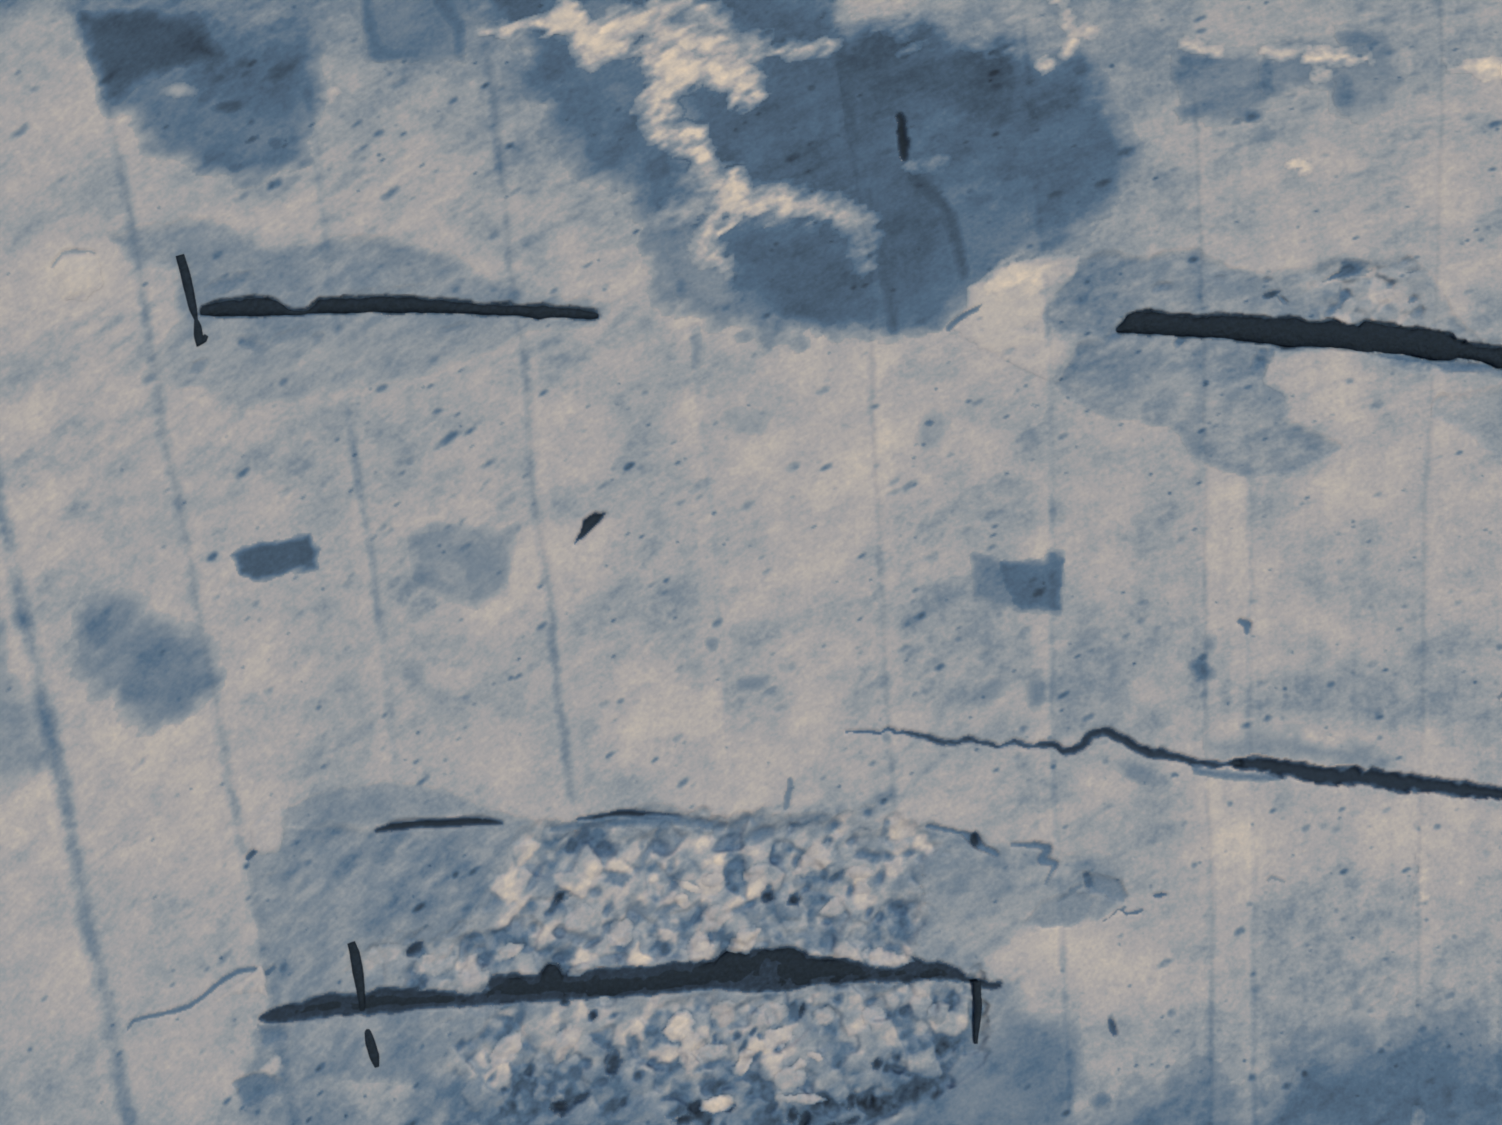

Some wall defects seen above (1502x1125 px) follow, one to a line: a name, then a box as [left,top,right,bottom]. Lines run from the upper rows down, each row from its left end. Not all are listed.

water stain [66,0,341,189]
water stain [358,0,1146,370]
crack [845,727,1502,800]
spalling [232,778,1131,1125]